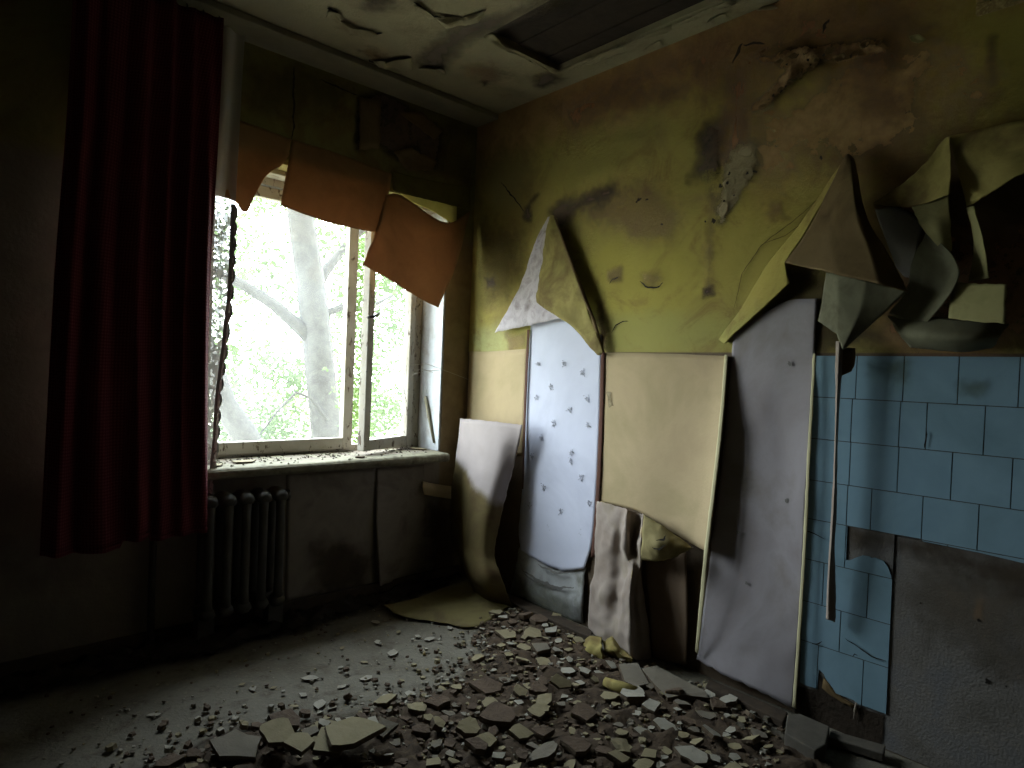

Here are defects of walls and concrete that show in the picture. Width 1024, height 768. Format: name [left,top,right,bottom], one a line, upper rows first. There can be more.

peeling [414,2,487,29]
spalling [484,33,560,74]
peeling [224,121,471,307]
damp [549,187,672,234]
damp [693,120,726,177]
flaking render [704,115,758,224]
damp [758,51,932,170]
peeling [792,526,1024,768]